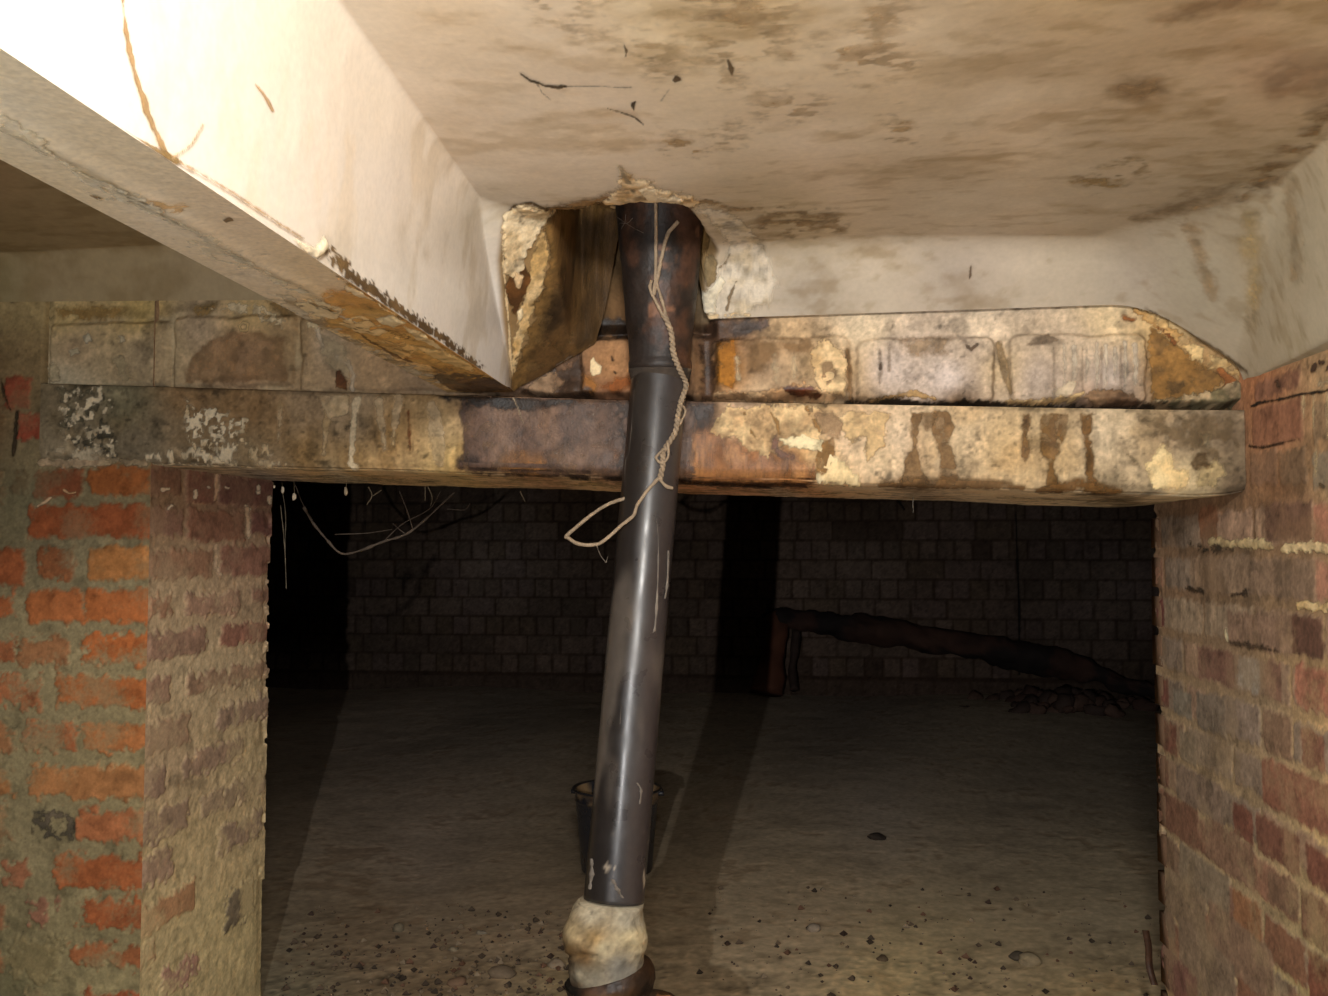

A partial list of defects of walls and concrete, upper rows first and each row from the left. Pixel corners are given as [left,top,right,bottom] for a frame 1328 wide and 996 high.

crack [122,0,303,239]
crack [521,74,572,89]
crack [610,87,642,123]
peeling [280,237,483,383]
spalling [501,166,775,463]
leakage [54,386,118,463]
leakage [145,400,290,470]
leakage [187,302,411,471]
corrosion [692,403,816,489]
crack [1249,440,1292,449]
crack [1251,389,1328,407]